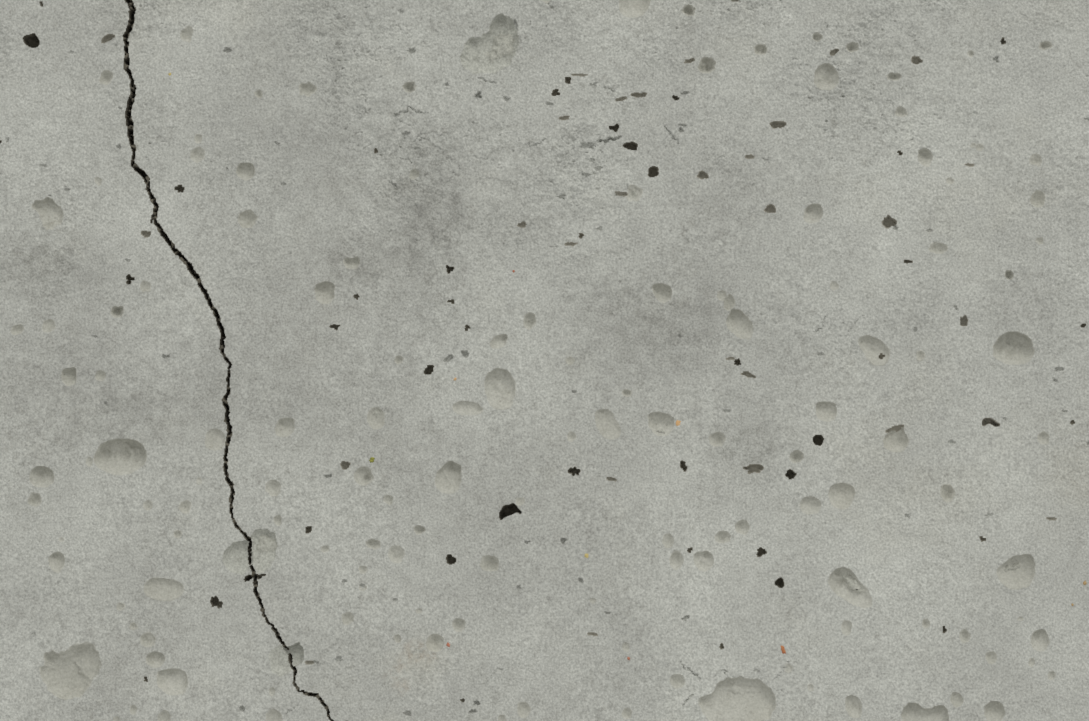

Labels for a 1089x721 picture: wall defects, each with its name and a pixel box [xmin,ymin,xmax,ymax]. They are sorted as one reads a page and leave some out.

crack [123,0,334,721]